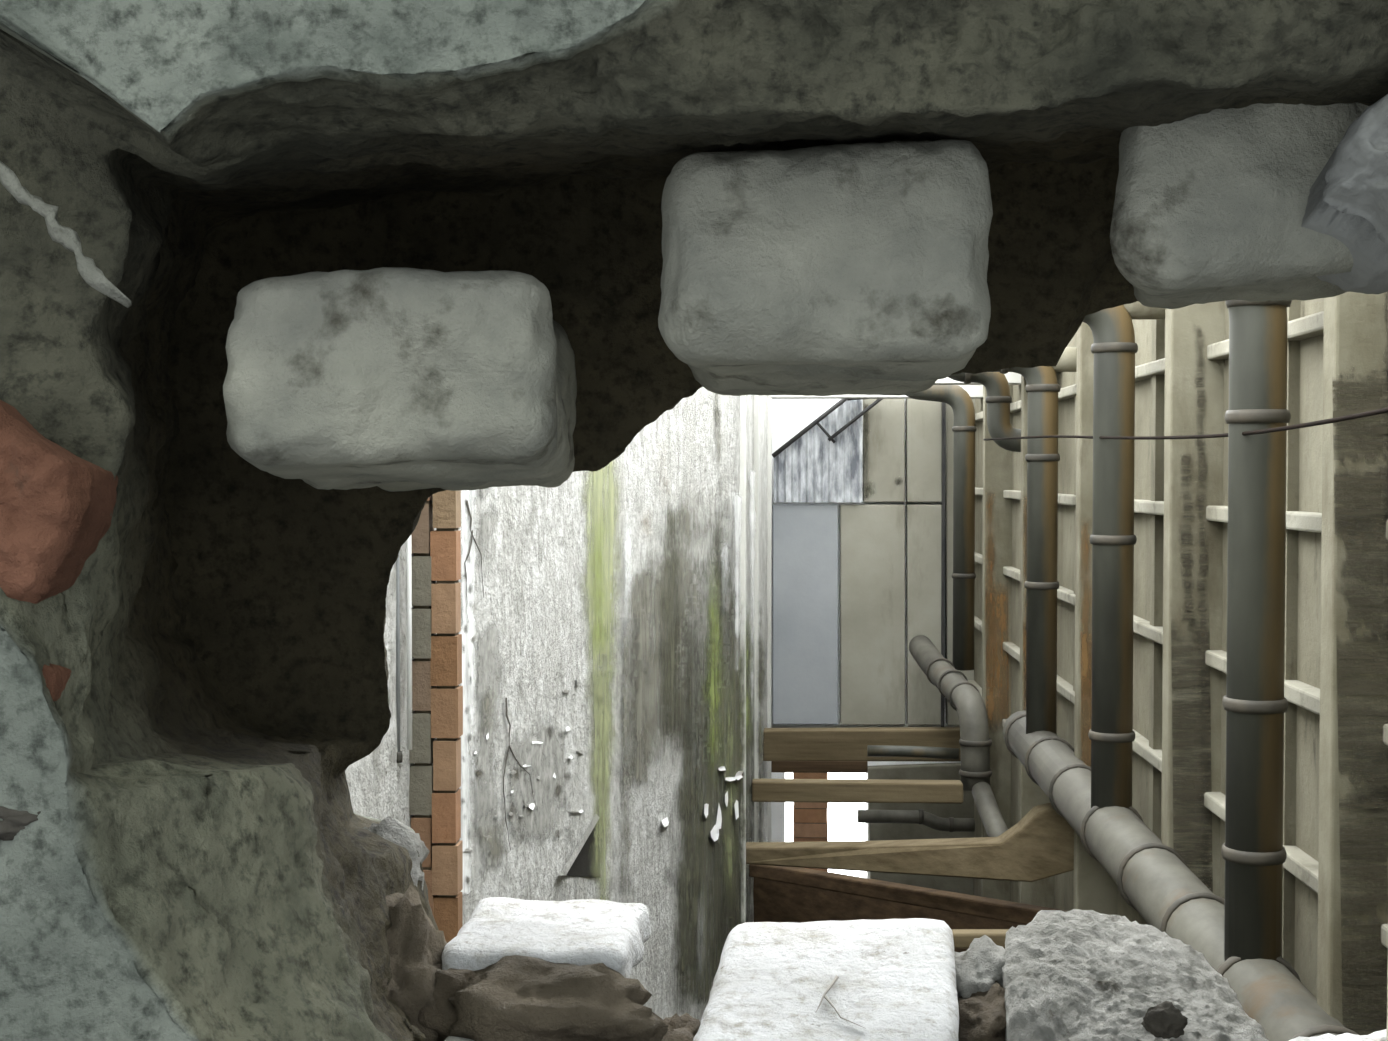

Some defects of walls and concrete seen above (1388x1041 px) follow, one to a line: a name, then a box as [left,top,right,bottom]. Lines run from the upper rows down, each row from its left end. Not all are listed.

peeling [460,490,601,894]
damp [586,461,764,1005]
peeling [704,766,743,842]
spalling [1141,1001,1188,1039]